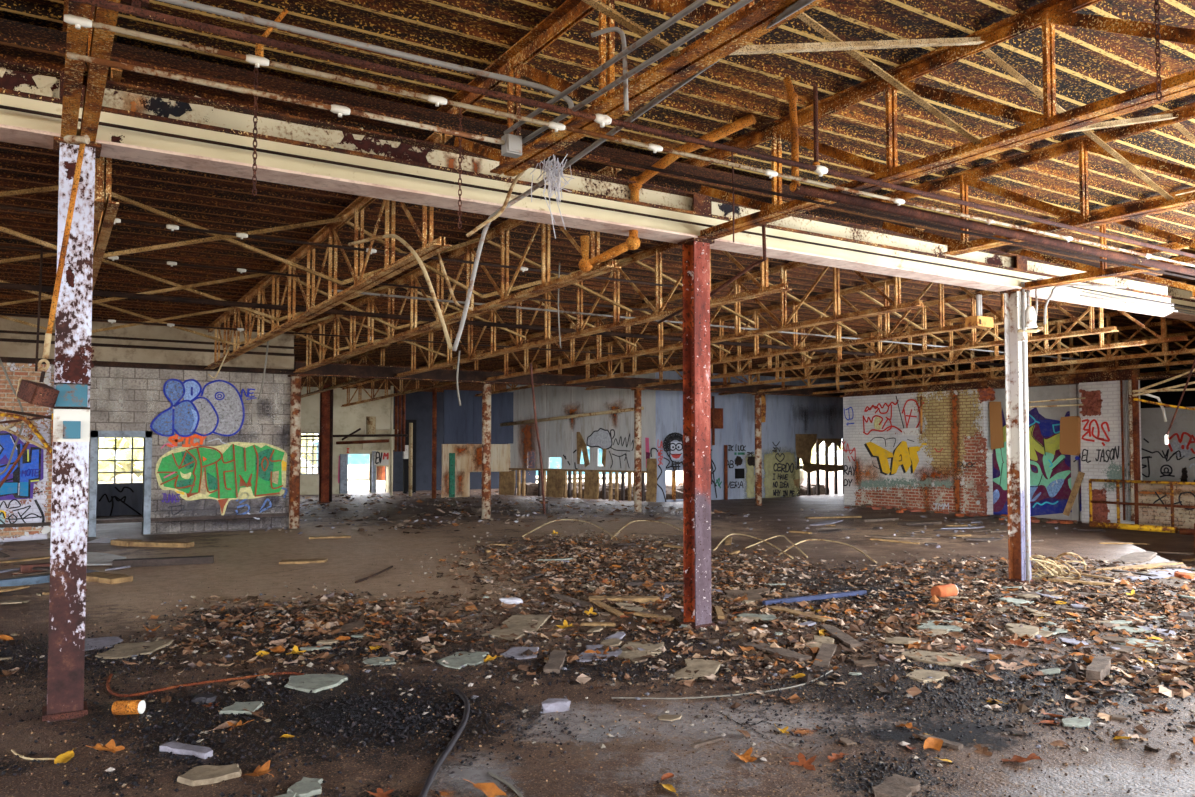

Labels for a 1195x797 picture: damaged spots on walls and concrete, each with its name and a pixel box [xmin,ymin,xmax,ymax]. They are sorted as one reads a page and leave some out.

peeling [0,67,60,97]
peeling [139,95,214,124]
peeling [328,126,441,165]
peeling [63,161,76,180]
peeling [66,261,75,288]
corrosion [985,255,1003,266]
peeling [853,385,995,514]